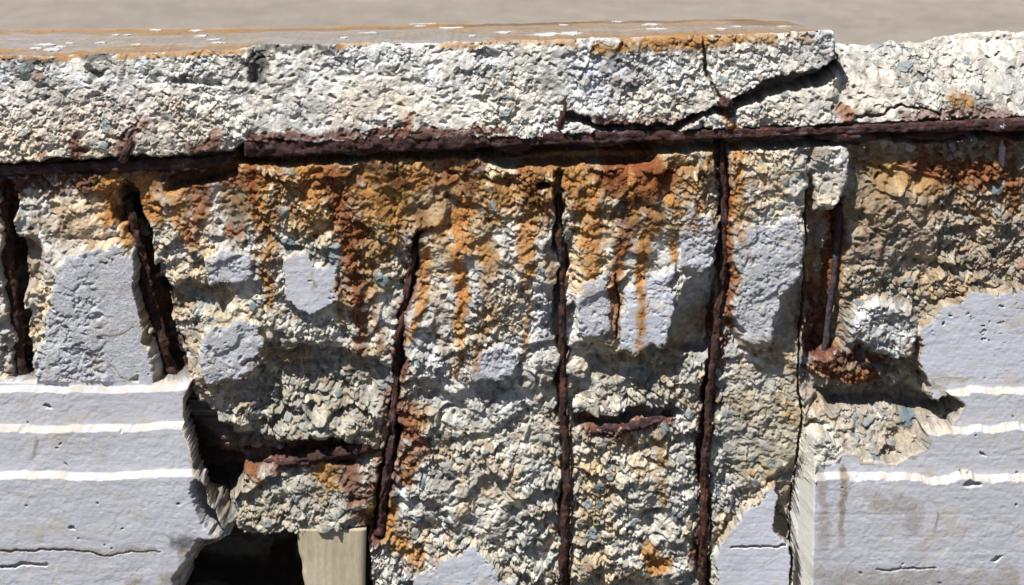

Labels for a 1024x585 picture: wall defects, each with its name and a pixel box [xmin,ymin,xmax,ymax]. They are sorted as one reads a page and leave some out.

spalling [0,29,1024,165]
crack [588,36,842,132]
rust [816,103,876,142]
crack [855,103,943,120]
rust [872,108,1024,209]
rust [0,113,714,569]
spalling [0,130,1024,585]
rust [696,108,752,479]
rust [795,208,888,385]
crack [0,548,157,569]